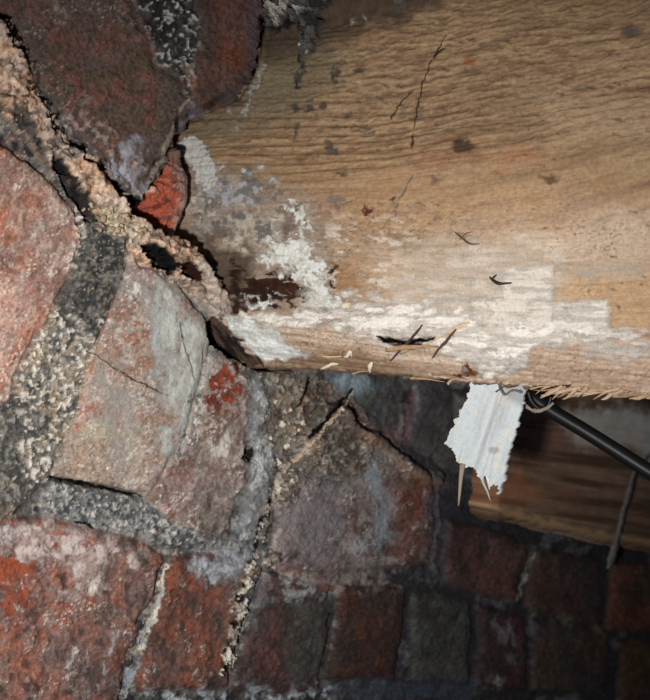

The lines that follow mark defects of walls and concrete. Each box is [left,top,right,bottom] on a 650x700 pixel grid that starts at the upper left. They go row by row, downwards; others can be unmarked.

crack [0,14,141,210]
leakage [240,63,267,116]
crack [149,223,226,290]
leakage [149,98,649,379]
crack [295,377,310,408]
crack [308,388,353,439]
peeling [444,382,528,506]
crack [47,476,143,497]